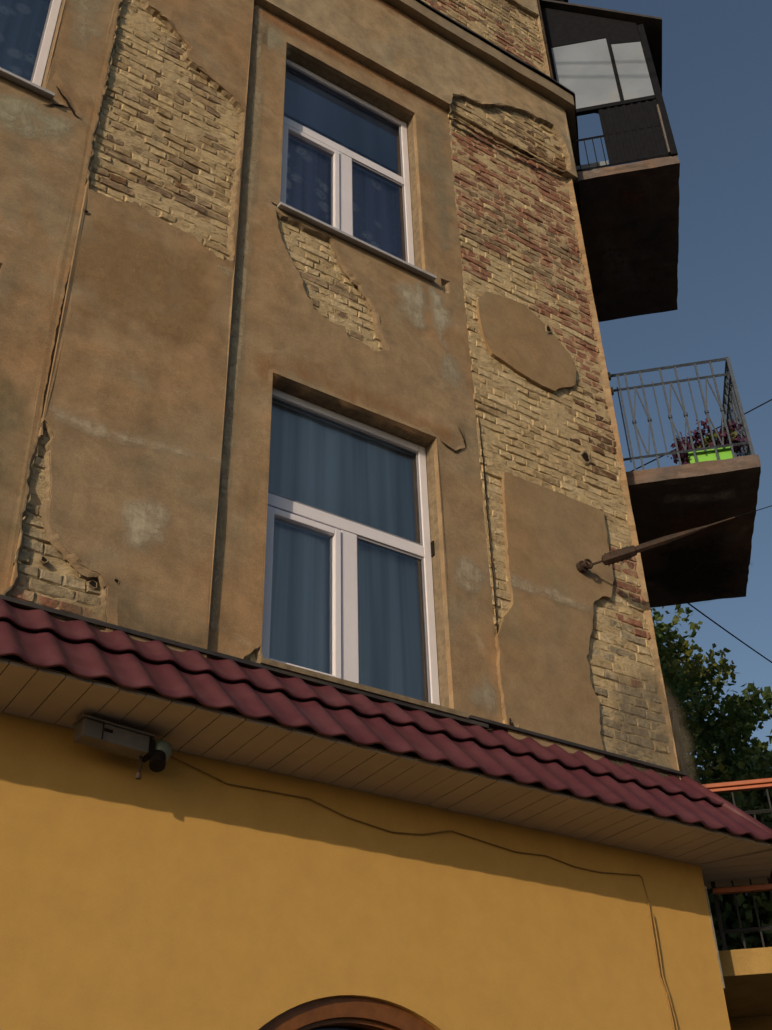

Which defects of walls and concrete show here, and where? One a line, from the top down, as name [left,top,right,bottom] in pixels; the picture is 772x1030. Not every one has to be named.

flaking render [84,0,248,261]
flaking render [422,0,549,76]
crack [42,267,71,415]
flaking render [3,415,120,631]
flaking render [276,212,388,352]
crack [441,416,499,634]
flaking render [446,94,673,794]